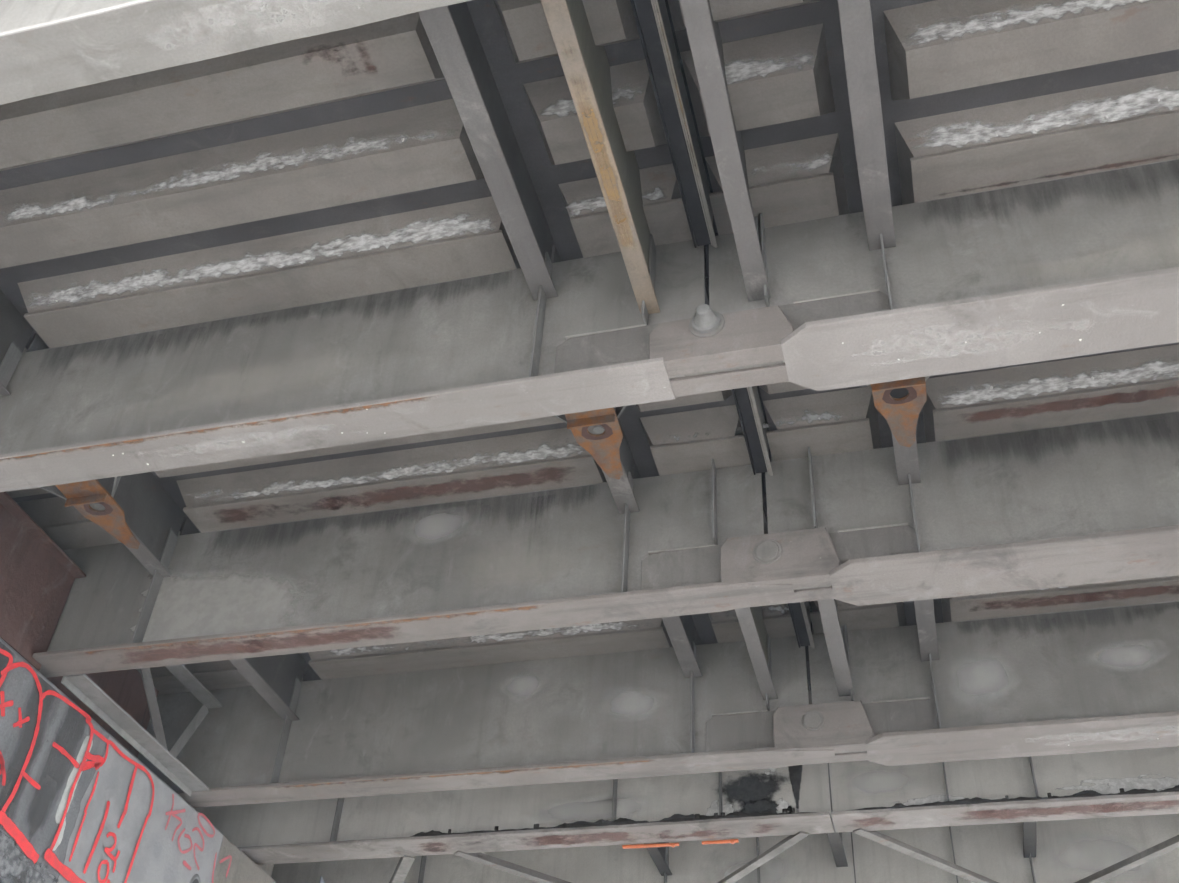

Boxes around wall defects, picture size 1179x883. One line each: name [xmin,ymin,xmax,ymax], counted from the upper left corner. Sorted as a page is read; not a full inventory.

efflorescence [911,0,1148,44]
leakage [925,88,1179,148]
efflorescence [141,134,433,194]
leakage [31,215,493,306]
efflorescence [941,361,1179,405]
rust [969,387,1179,422]
leakage [204,444,580,500]
rust [313,468,565,510]
rust [215,506,278,522]
rust [972,586,1179,611]
rust [86,606,536,663]
rust [965,800,1179,819]